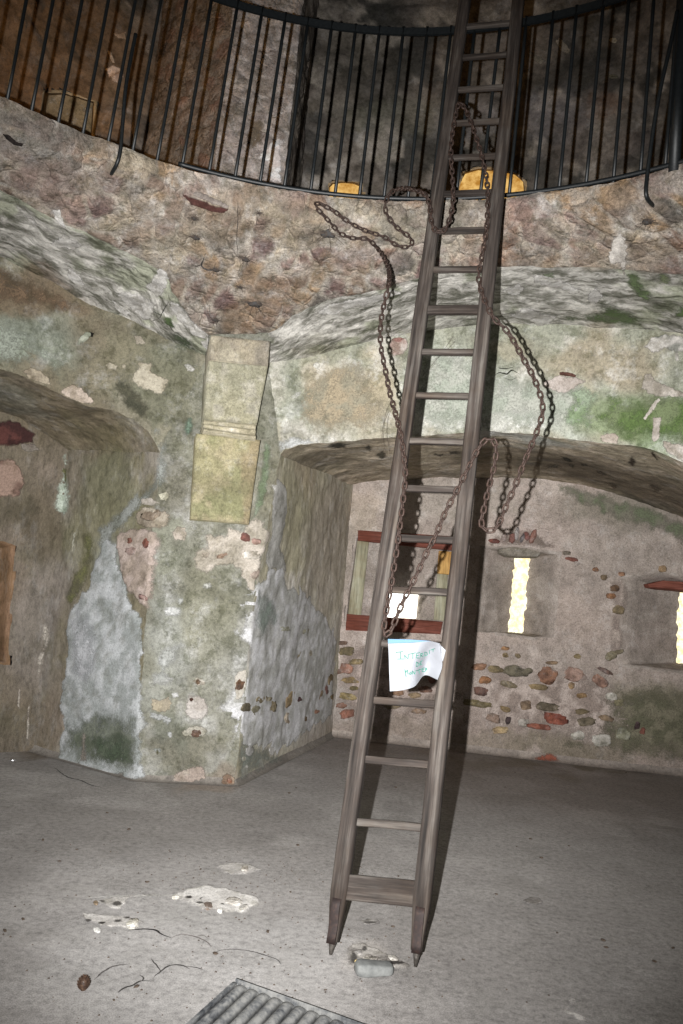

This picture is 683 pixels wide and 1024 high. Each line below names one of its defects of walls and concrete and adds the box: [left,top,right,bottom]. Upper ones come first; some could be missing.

flaking render [0,459,24,497]
water stain [56,463,70,514]
flaking render [58,492,208,779]
flaking render [193,479,365,768]
spalling [374,647,437,718]
spalling [83,885,258,933]
crack [94,928,281,992]